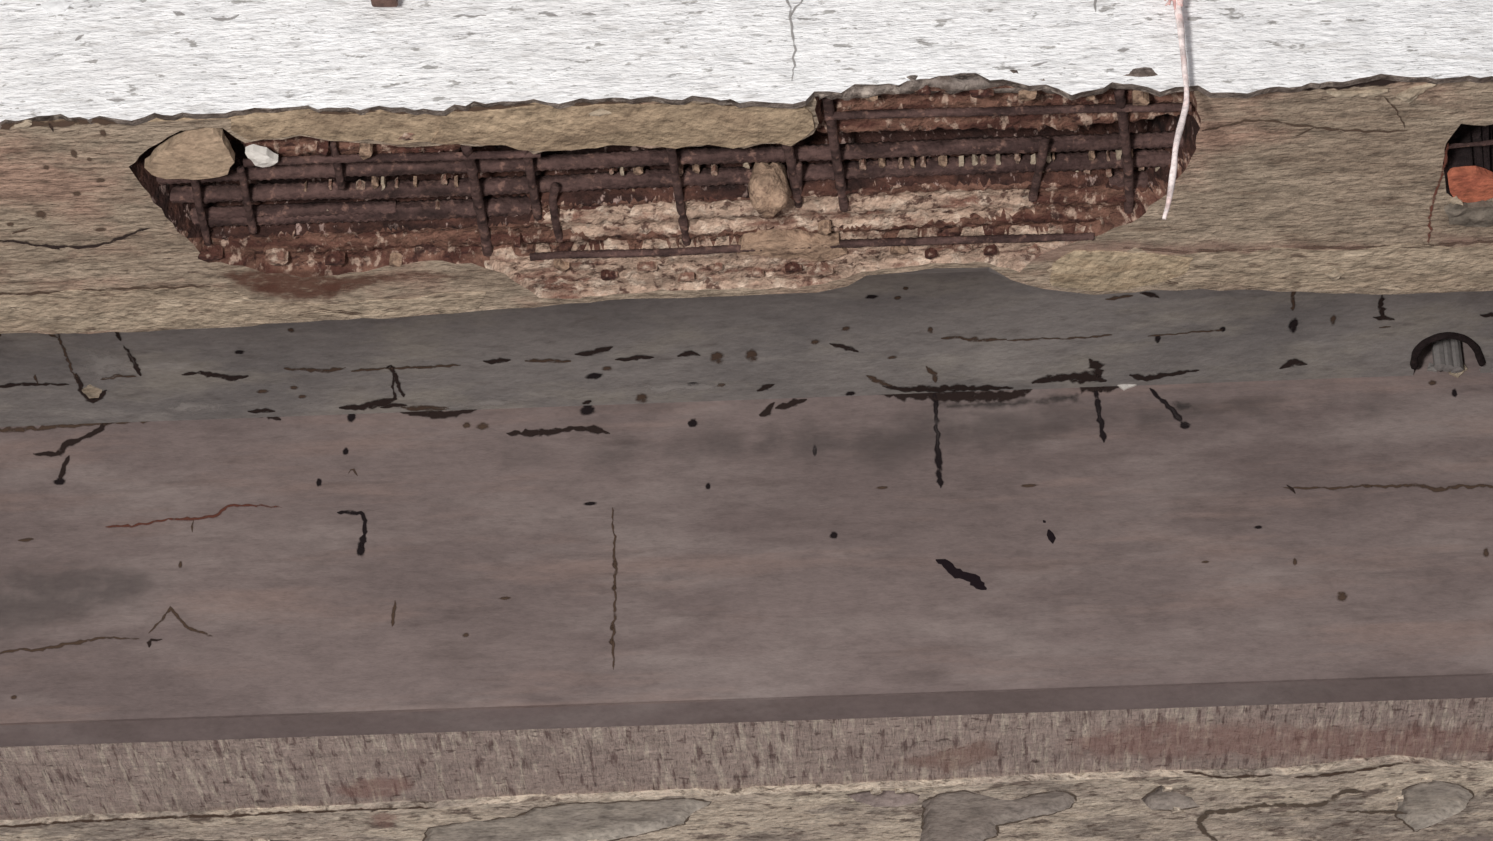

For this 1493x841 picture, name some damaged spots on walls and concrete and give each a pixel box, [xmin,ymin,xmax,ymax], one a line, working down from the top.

spalling [0,62,1493,299]
crack [0,227,150,250]
crack [0,285,209,310]
rust [228,272,405,315]
crack [941,292,1159,342]
crack [0,334,78,388]
crack [115,332,141,376]
crack [182,371,248,381]
crack [284,346,701,373]
crack [0,421,149,485]
crack [609,507,618,669]
crack [0,606,211,654]